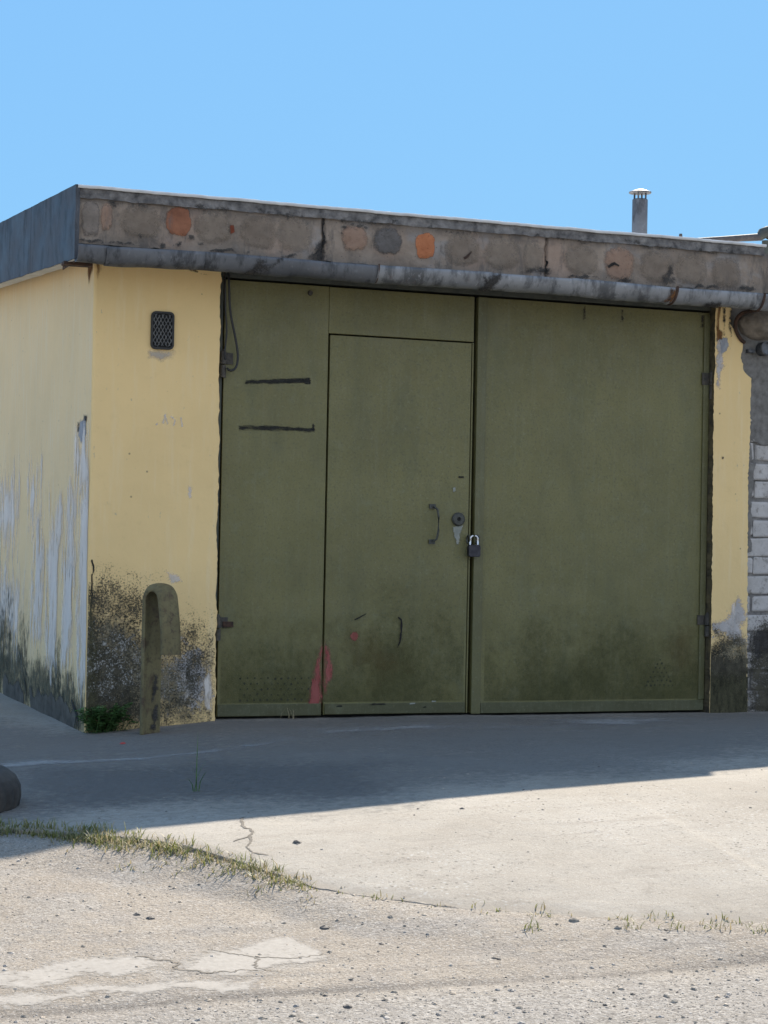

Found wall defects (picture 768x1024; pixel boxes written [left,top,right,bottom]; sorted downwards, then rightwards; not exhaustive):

spalling [716,308,768,553]
damp [0,591,29,670]
damp [86,566,147,733]
damp [160,613,215,725]
damp [710,619,768,713]
crack [234,817,268,860]